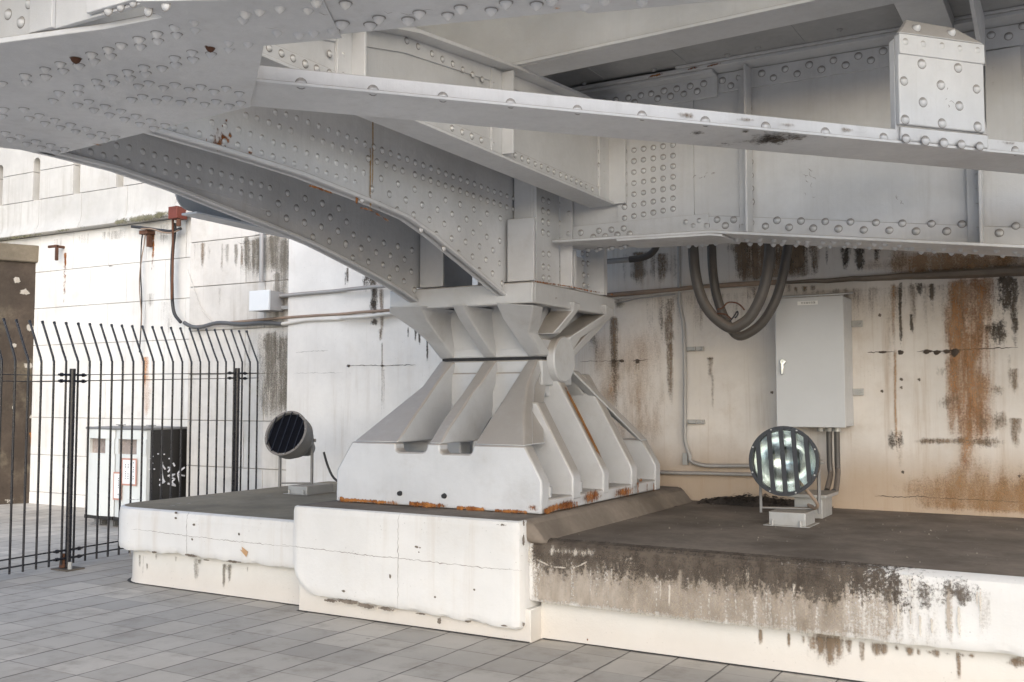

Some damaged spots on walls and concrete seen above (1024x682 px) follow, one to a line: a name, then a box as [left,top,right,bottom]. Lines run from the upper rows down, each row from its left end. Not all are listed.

corrosion [355,122,388,221]
water stain [227,236,289,320]
water stain [733,242,828,291]
water stain [841,247,880,269]
corrosion [899,253,1024,512]
corrosion [339,491,601,514]
water stain [528,538,981,662]